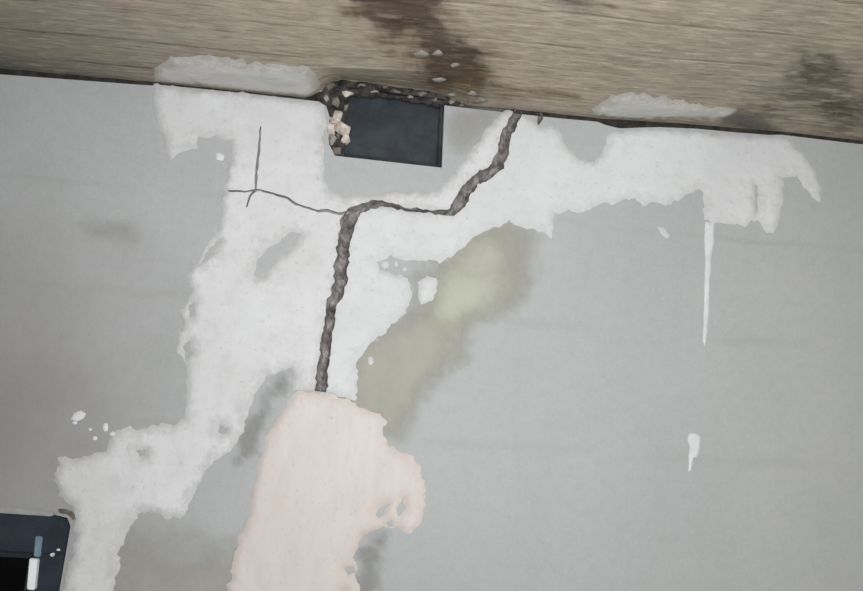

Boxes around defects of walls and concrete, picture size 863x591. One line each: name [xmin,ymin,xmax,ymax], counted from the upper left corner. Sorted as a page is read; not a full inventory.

spalling [316,80,464,156]
water stain [343,229,525,432]
crack [228,99,863,392]
water stain [114,551,230,591]